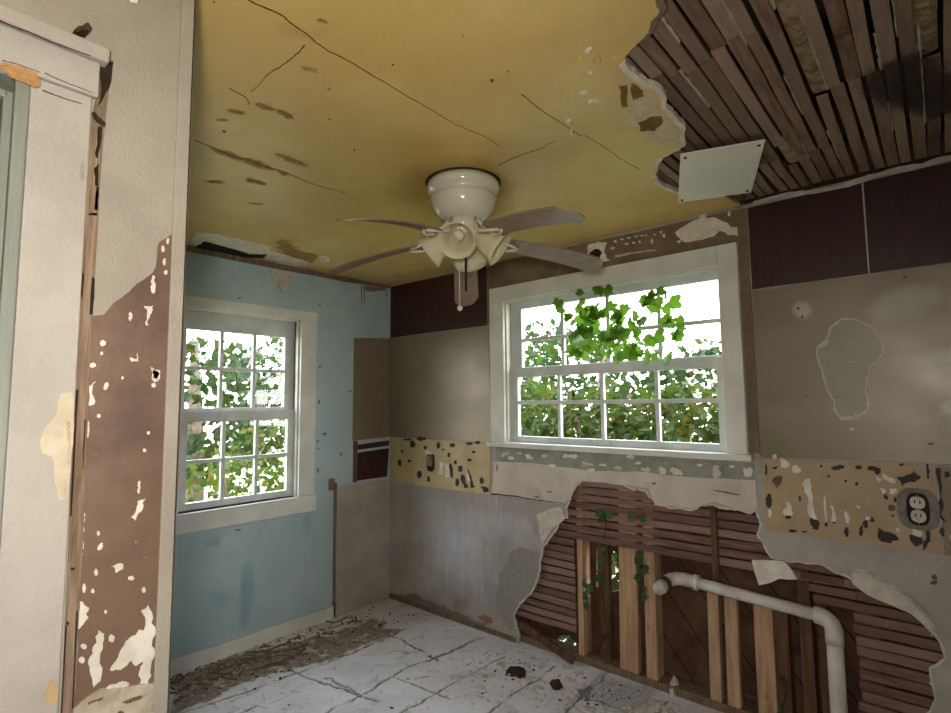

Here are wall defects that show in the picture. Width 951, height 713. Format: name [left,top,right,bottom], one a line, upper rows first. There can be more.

crack [229,0,637,168]
water stain [852,46,951,121]
flaking render [565,0,951,268]
peeling [150,238,169,293]
flaking render [192,232,330,292]
flaking render [491,256,584,289]
peeling [151,367,160,387]
peeling [87,382,109,438]
peeling [132,481,145,521]
peeling [78,584,95,629]
flaking render [491,447,948,713]
peeling [78,605,156,689]